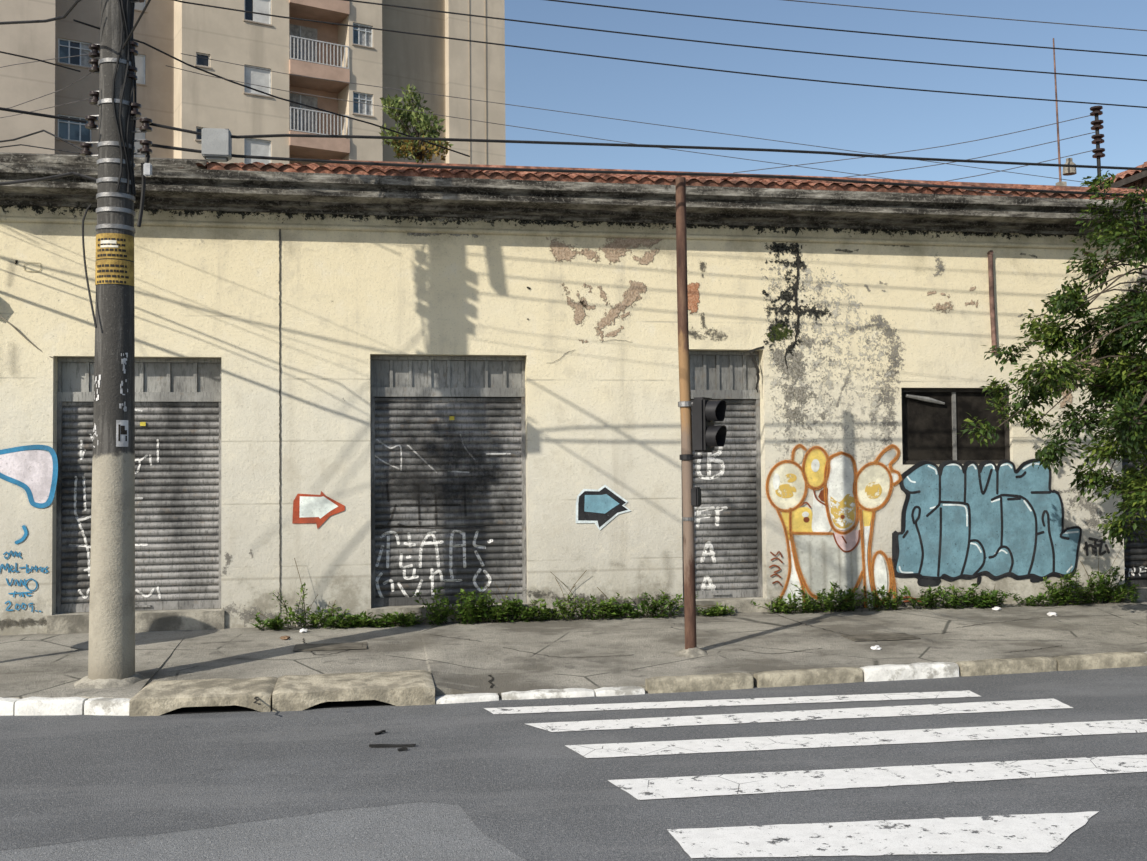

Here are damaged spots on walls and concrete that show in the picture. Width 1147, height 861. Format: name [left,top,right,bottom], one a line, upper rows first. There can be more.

leakage [0,205,96,218]
flaking render [547,237,662,265]
flaking render [562,280,647,344]
leakage [134,209,1101,359]
flaking render [687,282,700,315]
leakage [849,315,905,450]